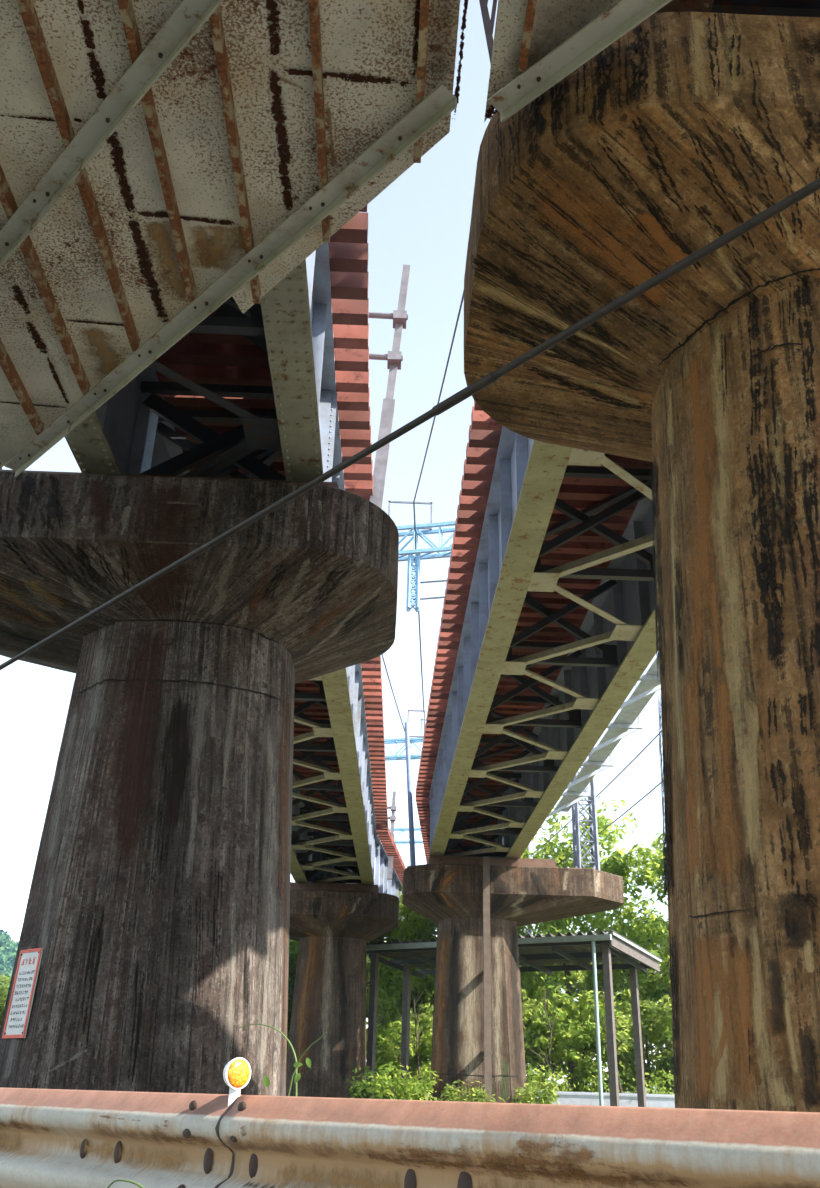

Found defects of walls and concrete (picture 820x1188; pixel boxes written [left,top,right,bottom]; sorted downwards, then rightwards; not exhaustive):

rust [78,0,107,100]
rust [266,0,281,56]
rust [269,0,420,211]
rust [452,0,468,120]
rust [0,286,69,408]
rust [107,130,245,323]
damp [472,13,820,736]
crack [658,268,820,373]
damp [651,454,701,901]
damp [711,327,820,975]
damp [157,669,280,1078]
damp [448,927,480,1087]